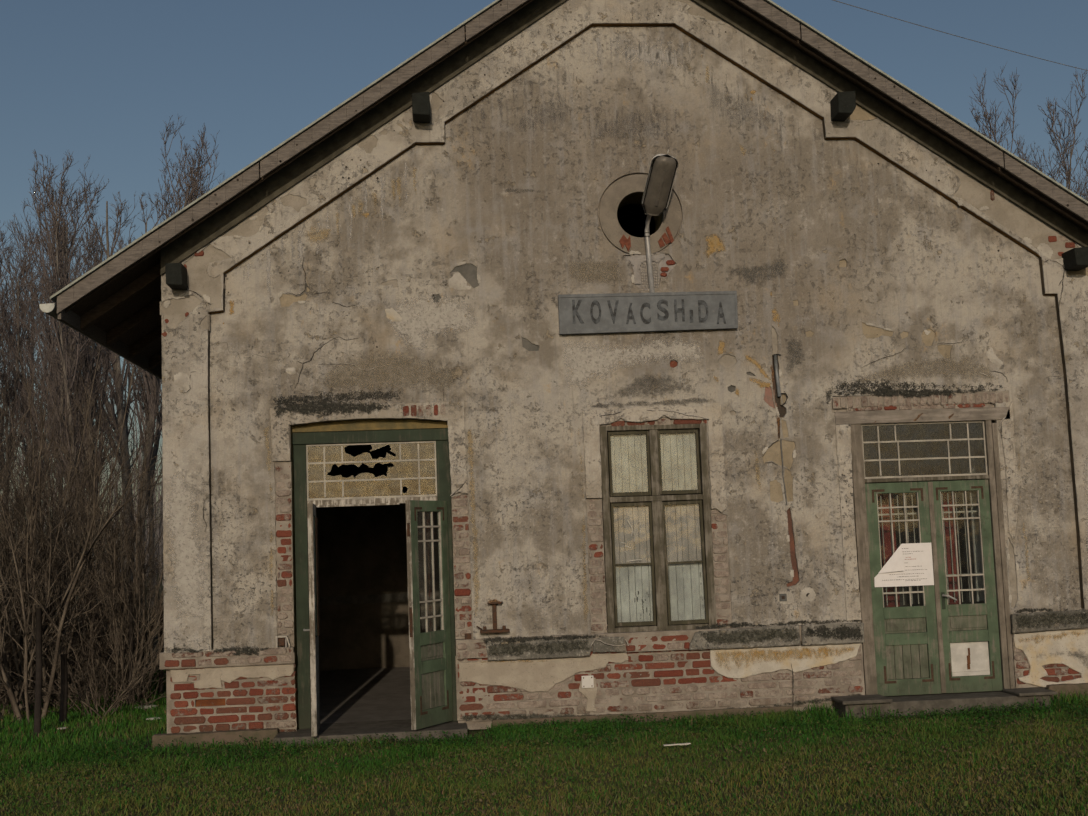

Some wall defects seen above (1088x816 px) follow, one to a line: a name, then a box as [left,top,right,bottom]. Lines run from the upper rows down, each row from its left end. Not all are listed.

crack [286,258,356,307]
spalling [451,262,481,288]
spalling [619,227,676,292]
crack [294,336,391,393]
leakage [274,296,476,418]
leakage [826,359,1002,405]
spalling [762,386,797,502]
flaking render [163,462,297,733]
flaking render [451,494,865,722]
leakage [483,633,606,644]
flaking render [1012,633,1081,688]